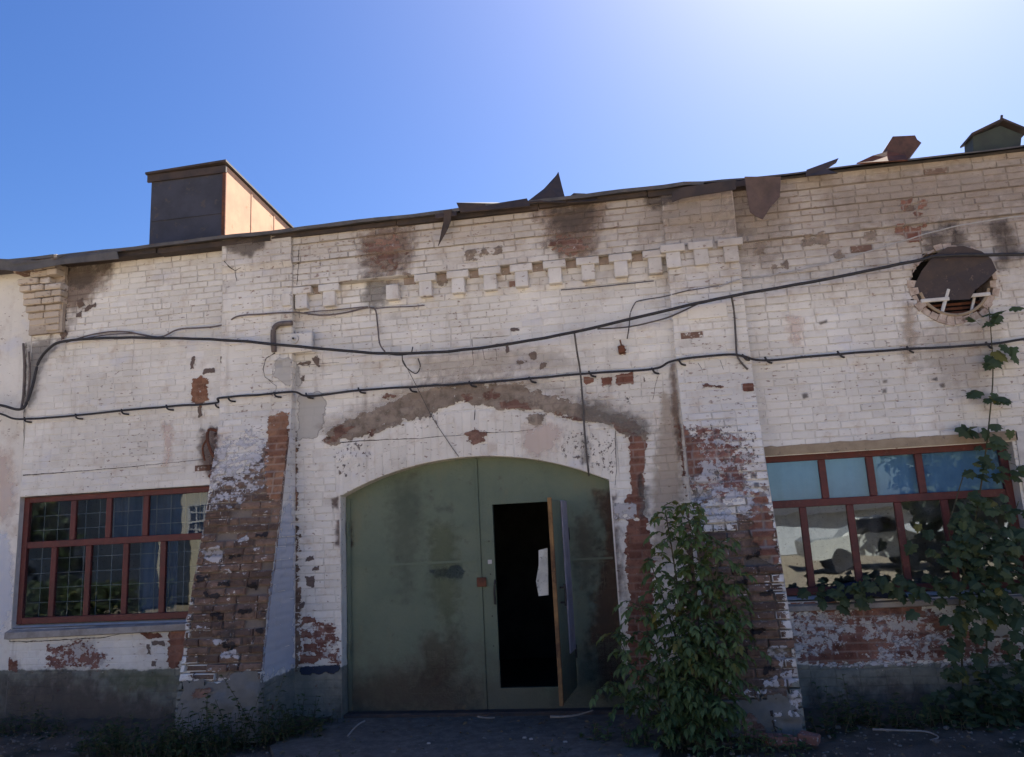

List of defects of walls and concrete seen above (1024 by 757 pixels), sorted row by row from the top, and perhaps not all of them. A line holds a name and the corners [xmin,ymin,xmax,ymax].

leakage [361,226,413,284]
leakage [535,204,604,257]
flaking render [190,356,222,418]
corrosion [201,427,218,482]
flaking render [141,411,342,700]
spalling [322,372,656,684]
flaking render [674,418,1022,738]
flaking render [45,639,114,673]